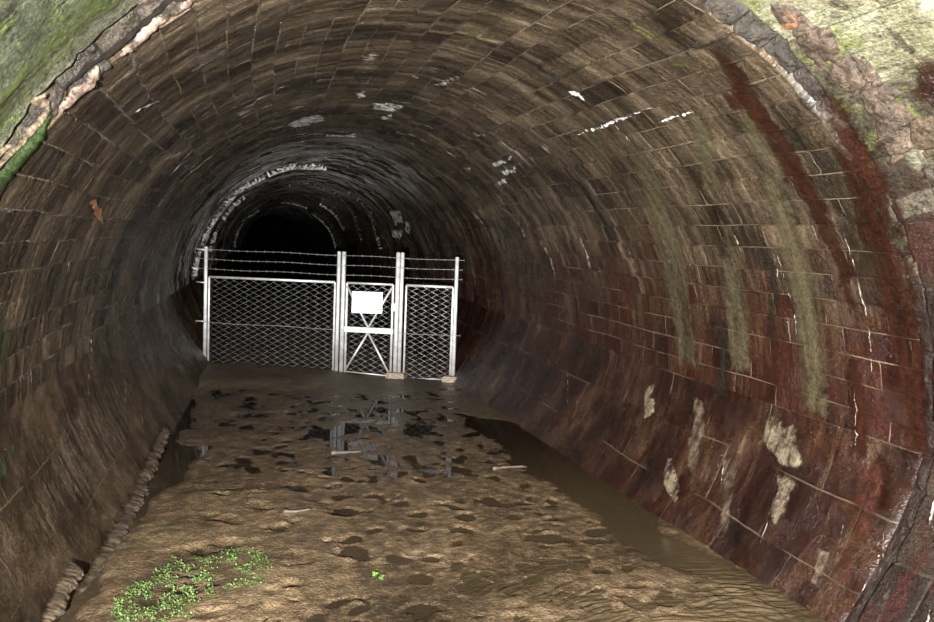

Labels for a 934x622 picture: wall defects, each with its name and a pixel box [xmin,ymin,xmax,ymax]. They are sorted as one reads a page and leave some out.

crack [48,0,186,116]
spalling [120,17,167,57]
corrosion [913,59,934,101]
spalling [0,66,100,168]
water stain [661,112,717,188]
water stain [717,221,749,396]
water stain [764,172,827,414]
spalling [644,385,655,418]
spalling [688,399,704,470]
spalling [764,416,801,467]
spalling [663,459,679,500]
spalling [771,476,794,524]